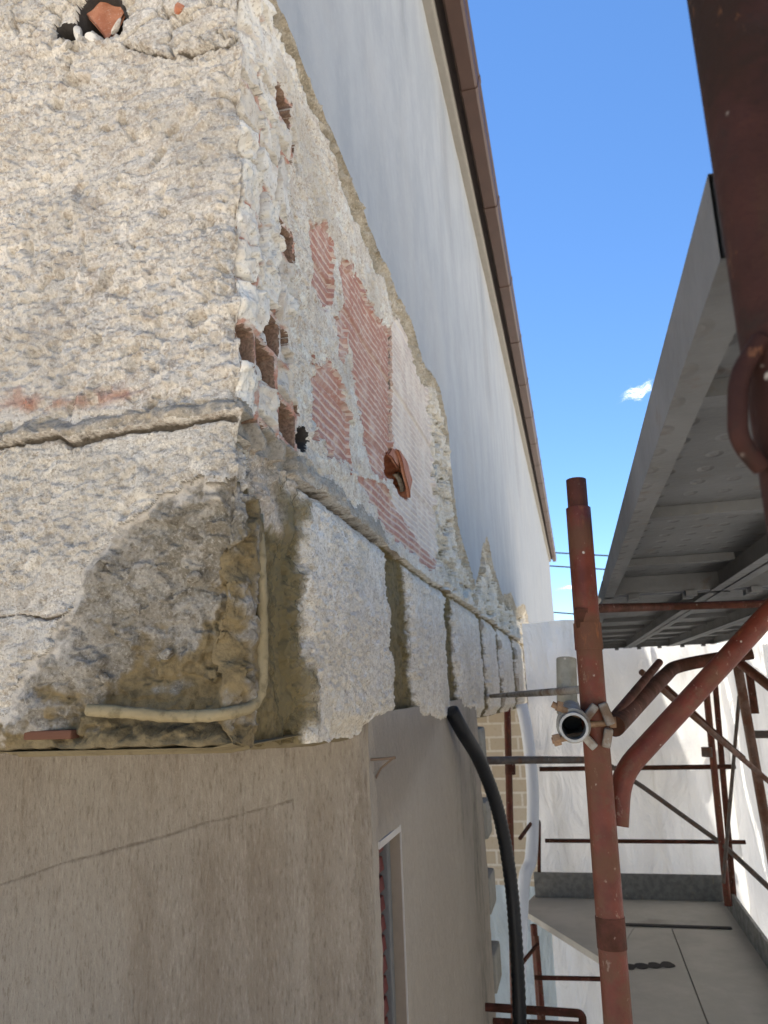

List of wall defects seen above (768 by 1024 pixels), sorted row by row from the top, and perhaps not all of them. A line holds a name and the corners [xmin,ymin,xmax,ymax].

spalling [60,25,97,52]
spalling [234,0,529,644]
crack [0,407,244,452]
damp [268,487,321,733]
crack [0,793,298,890]